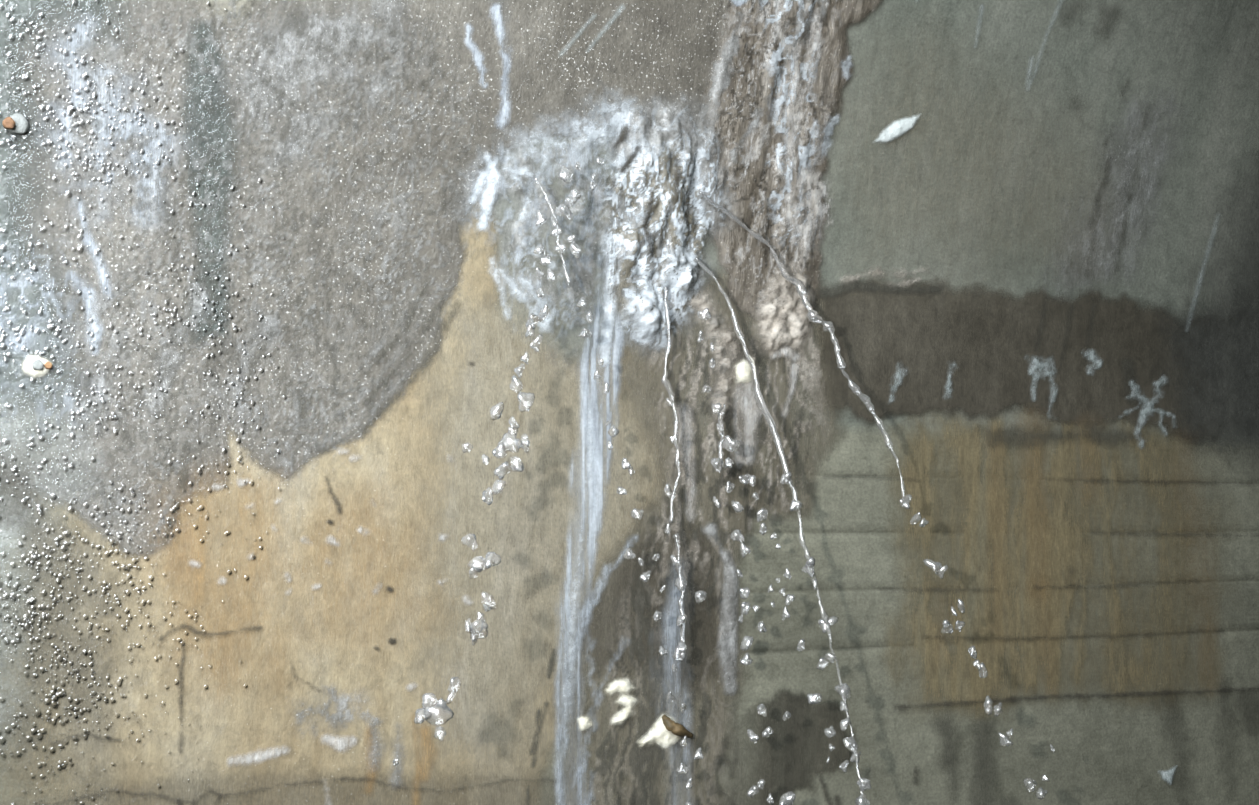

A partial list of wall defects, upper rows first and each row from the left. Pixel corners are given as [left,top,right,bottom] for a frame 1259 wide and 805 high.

water stain [730,0,827,249]
water stain [600,220,619,385]
water stain [581,302,611,568]
water stain [620,334,678,491]
peeling [736,360,752,382]
rust [8,201,666,805]
crack [161,625,261,704]
peeling [578,717,592,730]
peeling [607,679,636,724]
peeling [640,715,680,748]
water stain [733,690,852,805]
crack [820,776,838,805]